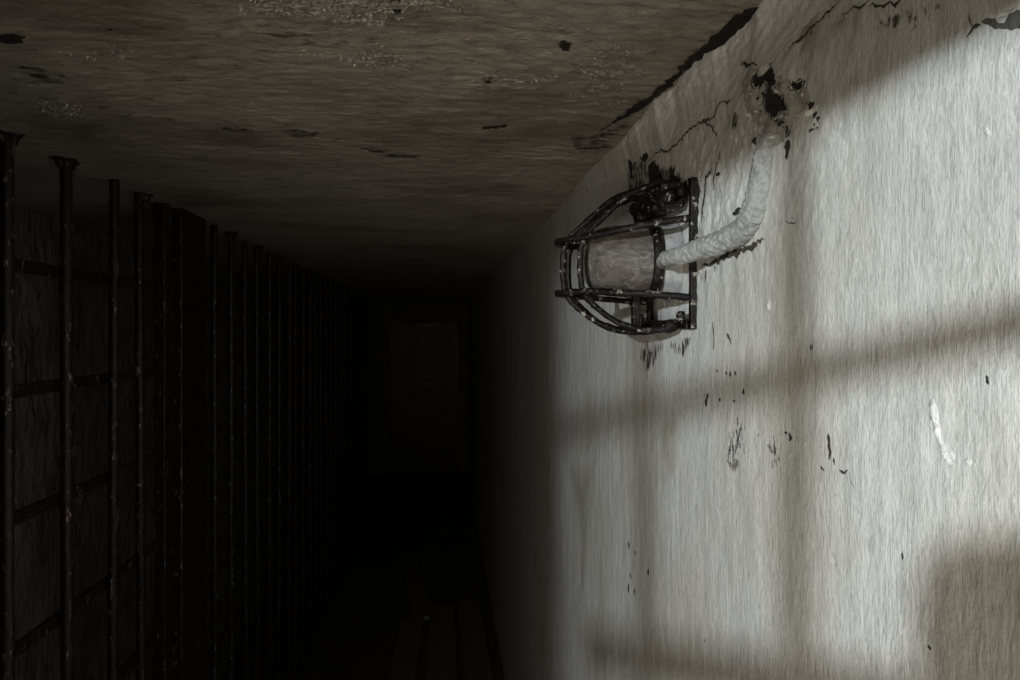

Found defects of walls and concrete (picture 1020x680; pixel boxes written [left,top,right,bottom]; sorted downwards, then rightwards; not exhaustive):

crack [788,0,901,48]
peeling [981,0,1020,30]
crack [648,100,730,218]
spalling [741,61,820,159]